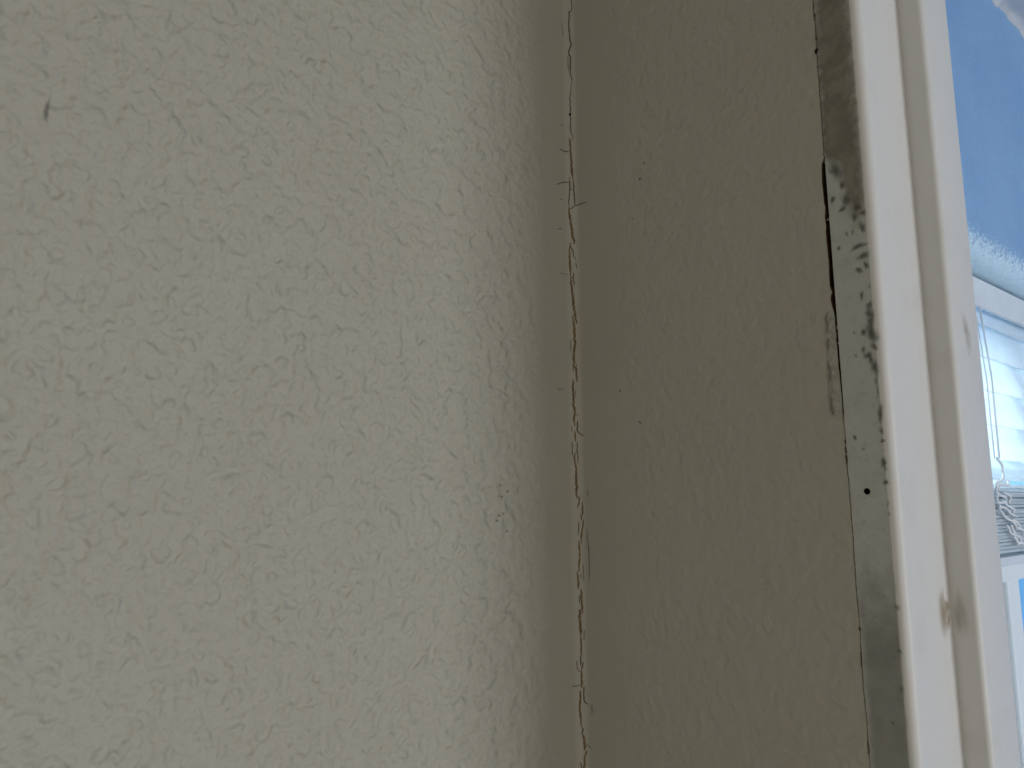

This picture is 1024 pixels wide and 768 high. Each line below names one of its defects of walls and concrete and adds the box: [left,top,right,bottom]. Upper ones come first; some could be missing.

crack [557,0,595,768]
mould [861,293,877,371]